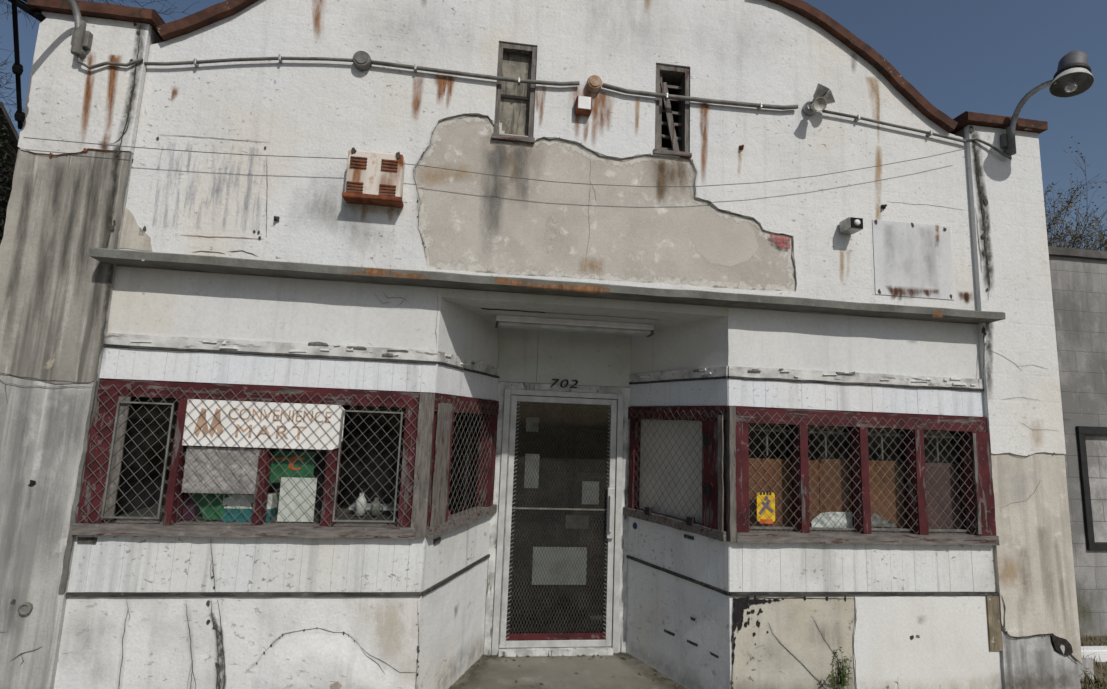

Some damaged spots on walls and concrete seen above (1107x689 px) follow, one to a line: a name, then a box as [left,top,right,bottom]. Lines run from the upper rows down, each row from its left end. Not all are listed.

rust [84,62,92,127]
rust [108,57,118,114]
rust [436,76,452,98]
rust [576,90,609,136]
flaking render [414,115,796,291]
damp [973,135,992,278]
crack [893,125,1040,388]
peeling [289,342,366,352]
crack [1000,397,1073,457]
crack [186,549,225,689]
crack [253,609,420,689]
peeling [730,596,855,689]